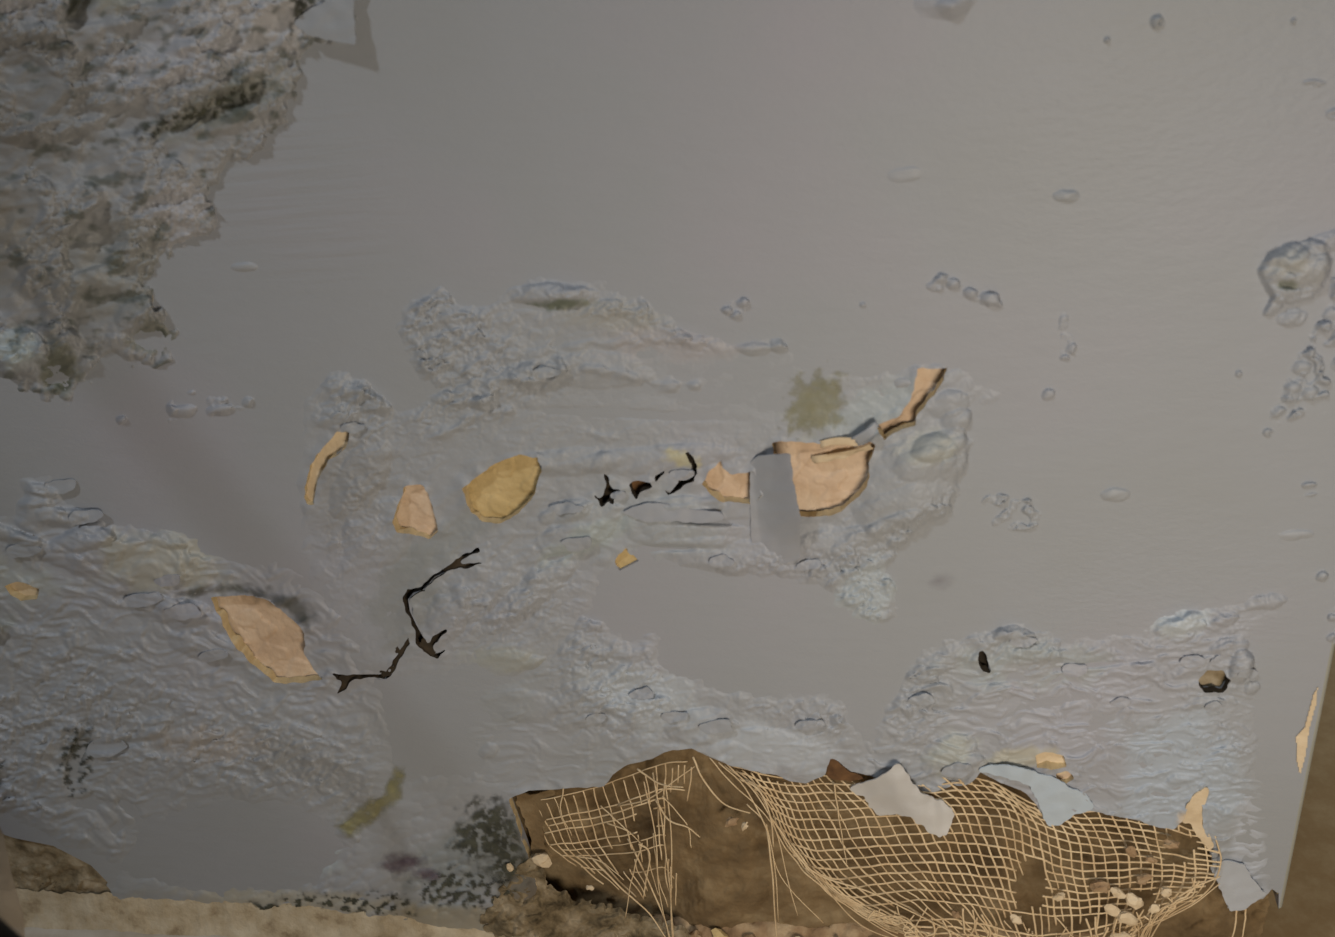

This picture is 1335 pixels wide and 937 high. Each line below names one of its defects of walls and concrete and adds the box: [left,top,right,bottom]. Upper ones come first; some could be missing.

flaking render [306,432,349,501]
flaking render [466,454,542,519]
flaking render [704,368,945,564]
crack [338,556,473,692]
spalling [0,475,1271,937]